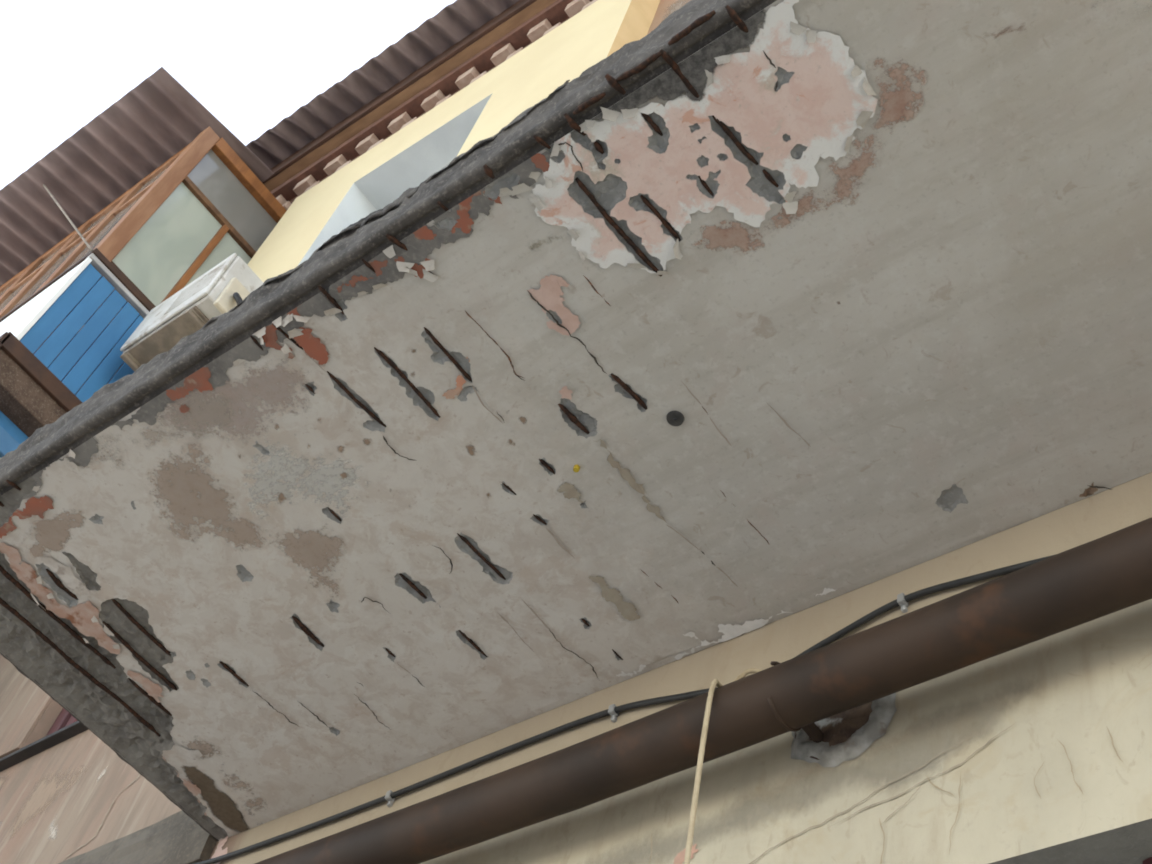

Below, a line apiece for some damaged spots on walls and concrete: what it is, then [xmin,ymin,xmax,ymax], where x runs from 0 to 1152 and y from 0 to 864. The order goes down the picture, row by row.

rust [771,59,925,227]
peeling [111,0,878,433]
rust [695,221,765,252]
spalling [322,507,342,524]
spalling [455,532,513,584]
spalling [326,599,340,613]
spalling [394,573,441,607]
spalling [0,437,249,864]
spalling [290,614,325,651]
spalling [456,630,488,660]
crack [749,722,1017,864]